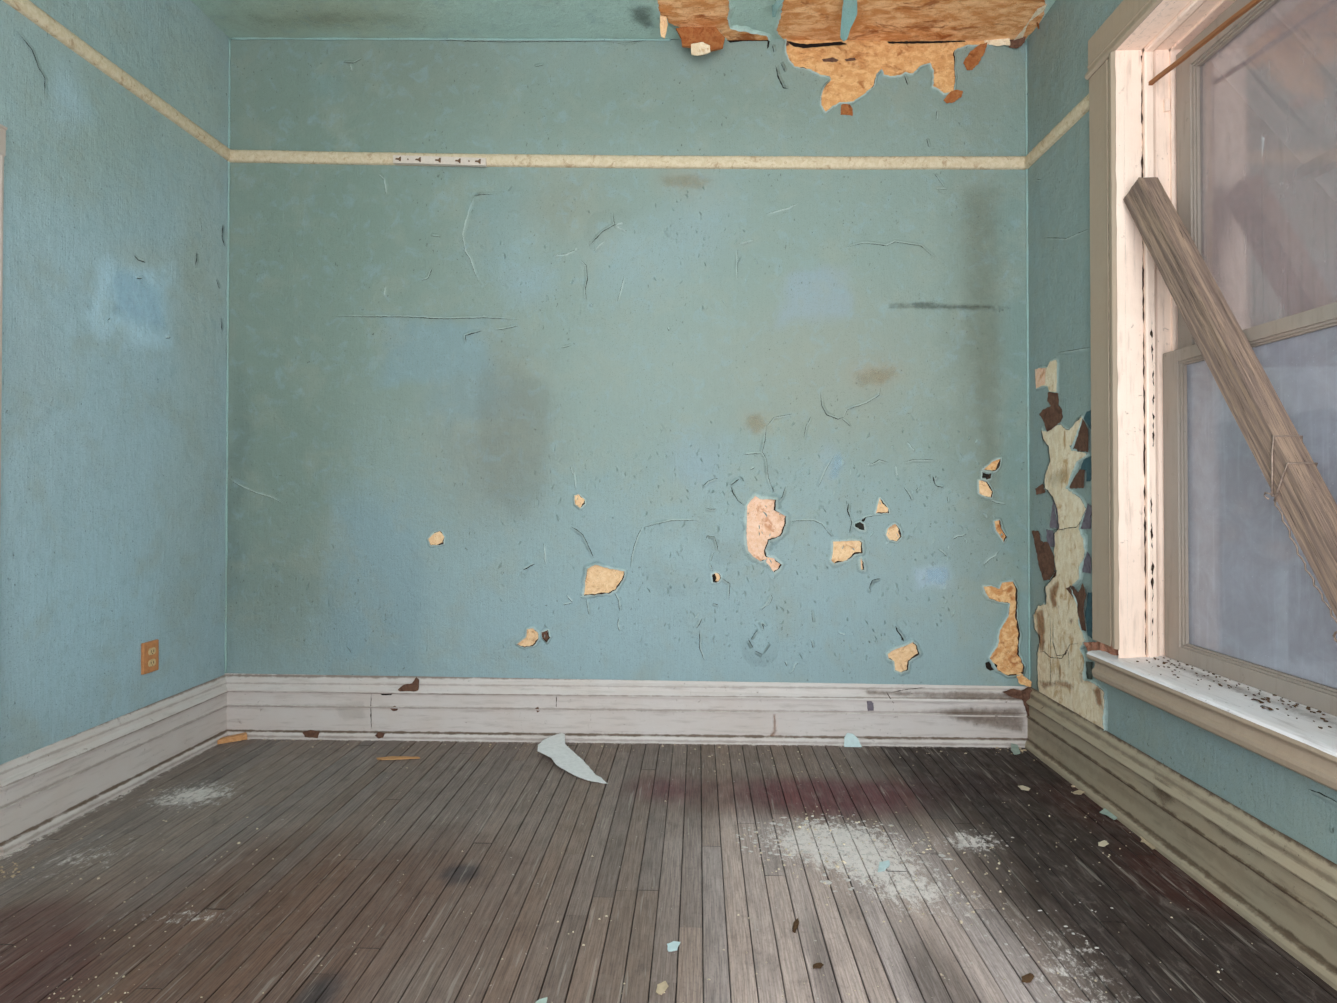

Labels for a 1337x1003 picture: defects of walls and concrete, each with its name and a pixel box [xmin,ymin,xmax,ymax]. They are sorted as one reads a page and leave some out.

flaking render [660,15,668,38]
flaking render [786,40,988,111]
flaking render [572,421,1008,677]
flaking render [478,611,554,650]
spalling [1083,641,1119,663]